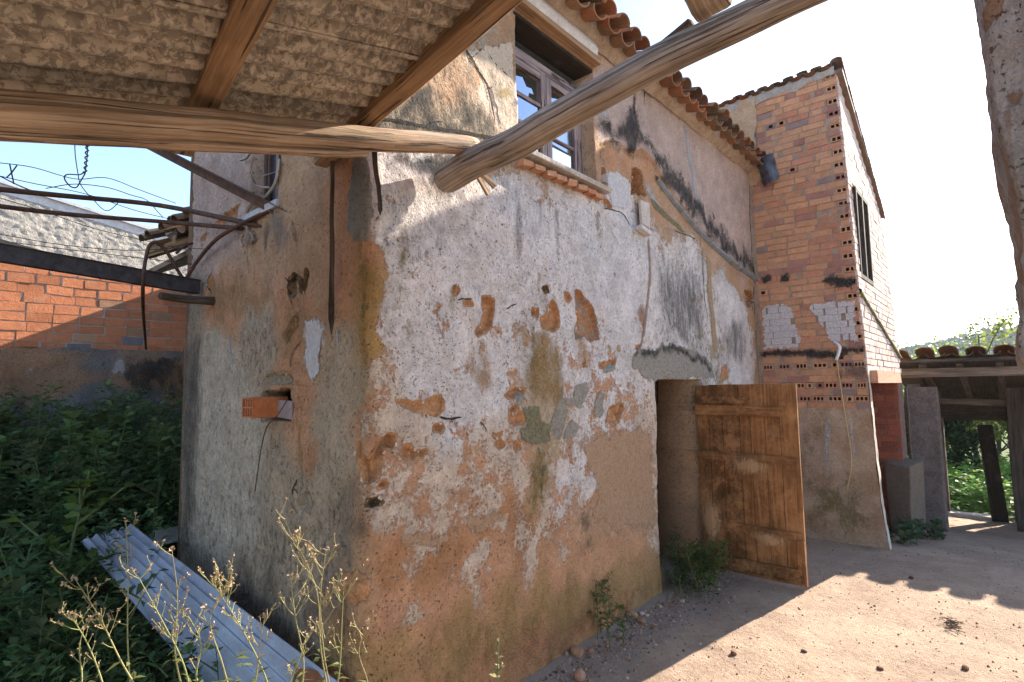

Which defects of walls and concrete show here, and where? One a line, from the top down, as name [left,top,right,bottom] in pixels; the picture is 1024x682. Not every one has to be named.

crack [383,48,511,138]
spalling [600,142,647,209]
leakage [602,91,772,283]
spalling [453,283,495,338]
spalling [531,285,621,369]
leakage [637,239,742,373]
leakage [760,346,864,359]
peeling [809,299,858,342]
spalling [395,394,446,435]
spalling [492,386,526,452]
spalling [353,432,429,508]
peeling [577,403,656,534]